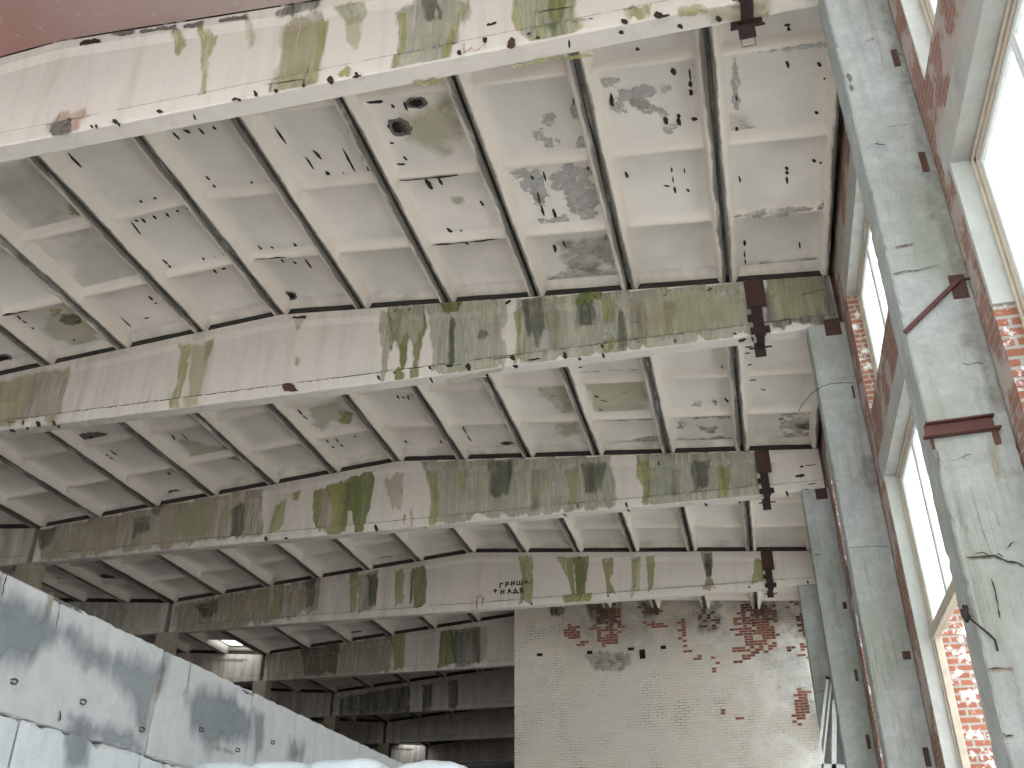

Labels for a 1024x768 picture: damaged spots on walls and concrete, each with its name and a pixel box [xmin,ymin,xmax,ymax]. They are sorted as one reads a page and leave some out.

damp [392,0,469,68]
damp [513,0,581,41]
peeling [601,68,697,134]
peeling [511,163,599,224]
damp [379,281,755,382]
damp [332,471,375,535]
damp [422,456,616,524]
damp [636,451,758,505]
crack [967,489,1024,618]
flaking render [564,595,626,647]
flaking render [637,603,720,673]
flaking render [698,601,808,663]